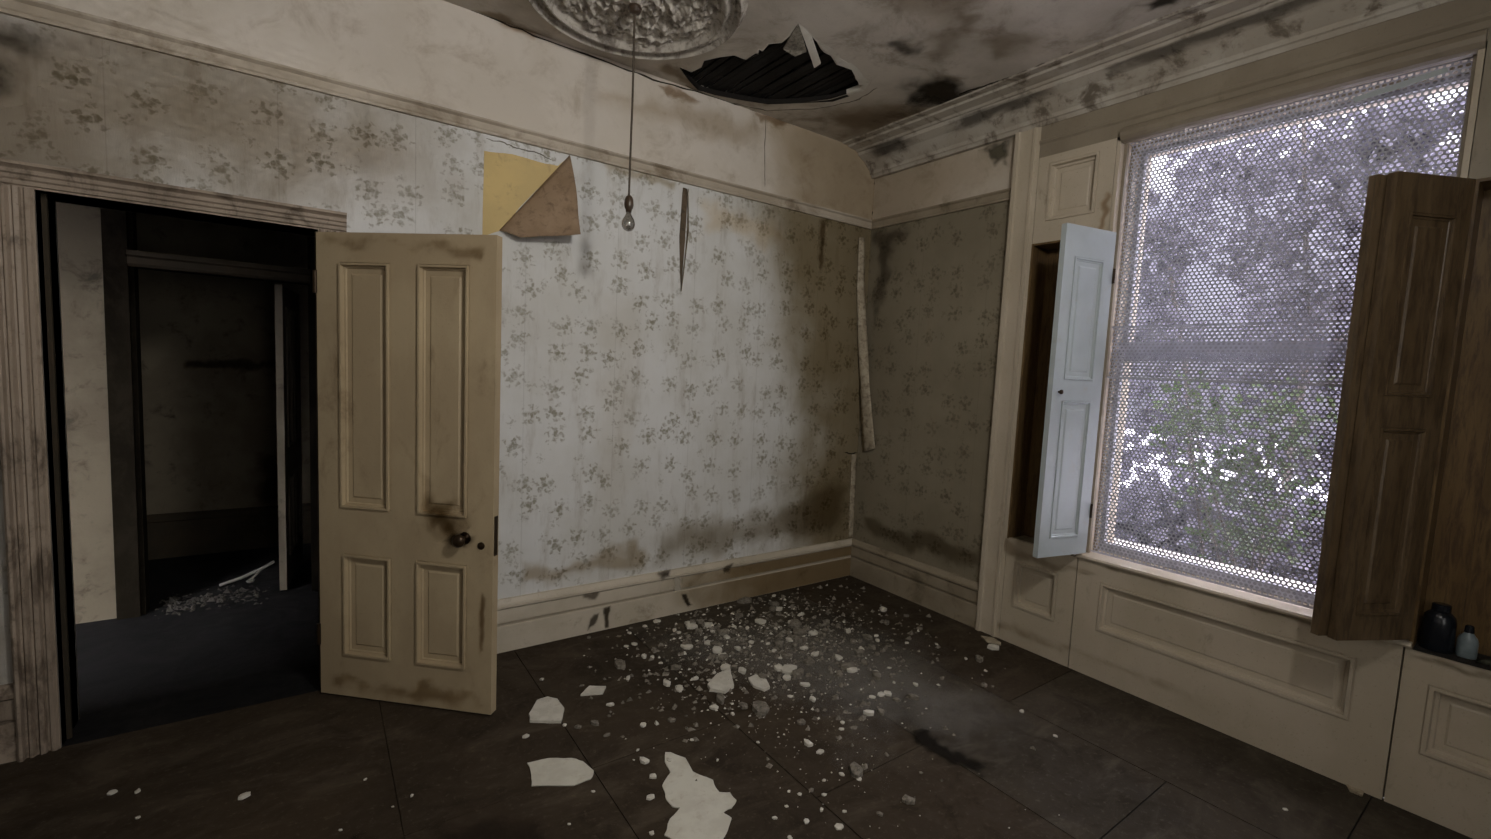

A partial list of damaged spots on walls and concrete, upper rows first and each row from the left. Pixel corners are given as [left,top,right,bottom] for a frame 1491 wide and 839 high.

mould [1150,0,1176,8]
flaking render [783,24,866,85]
mould [986,140,1007,163]
leakage [792,213,899,544]
peeling [849,238,875,537]